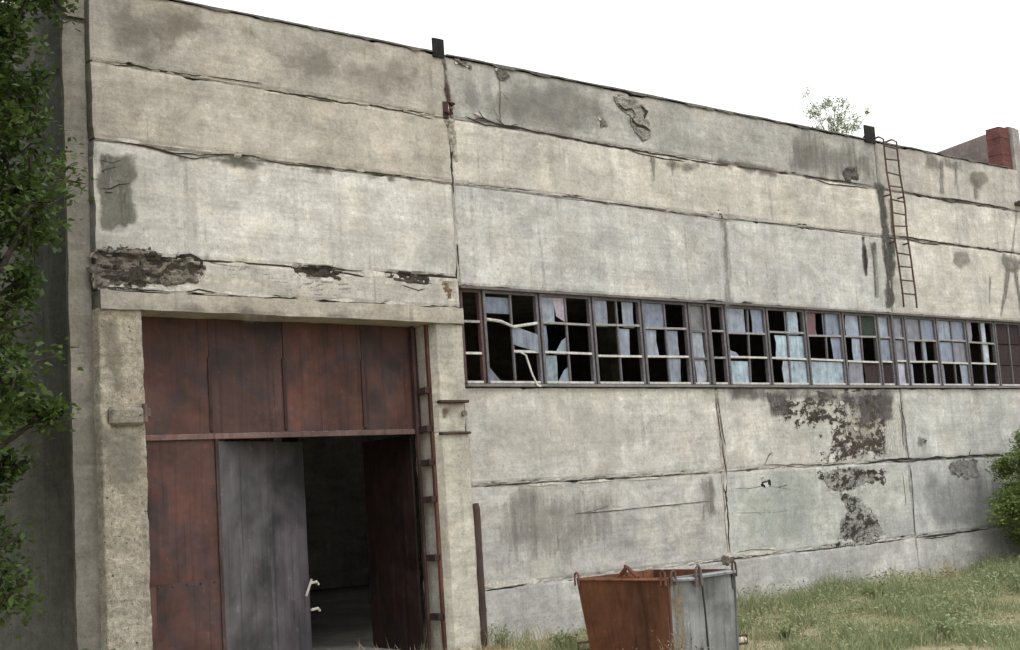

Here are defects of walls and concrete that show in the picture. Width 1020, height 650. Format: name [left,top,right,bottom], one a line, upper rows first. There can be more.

spalling [614,95,651,141]
damp [97,154,137,230]
crack [94,62,1019,274]
spalling [86,244,206,295]
spalling [225,264,359,296]
spalling [386,271,429,291]
damp [871,183,895,308]
damp [1001,233,1020,313]
crack [486,473,701,488]
crack [577,397,1004,564]
peeling [769,388,886,547]
spalling [949,458,980,480]